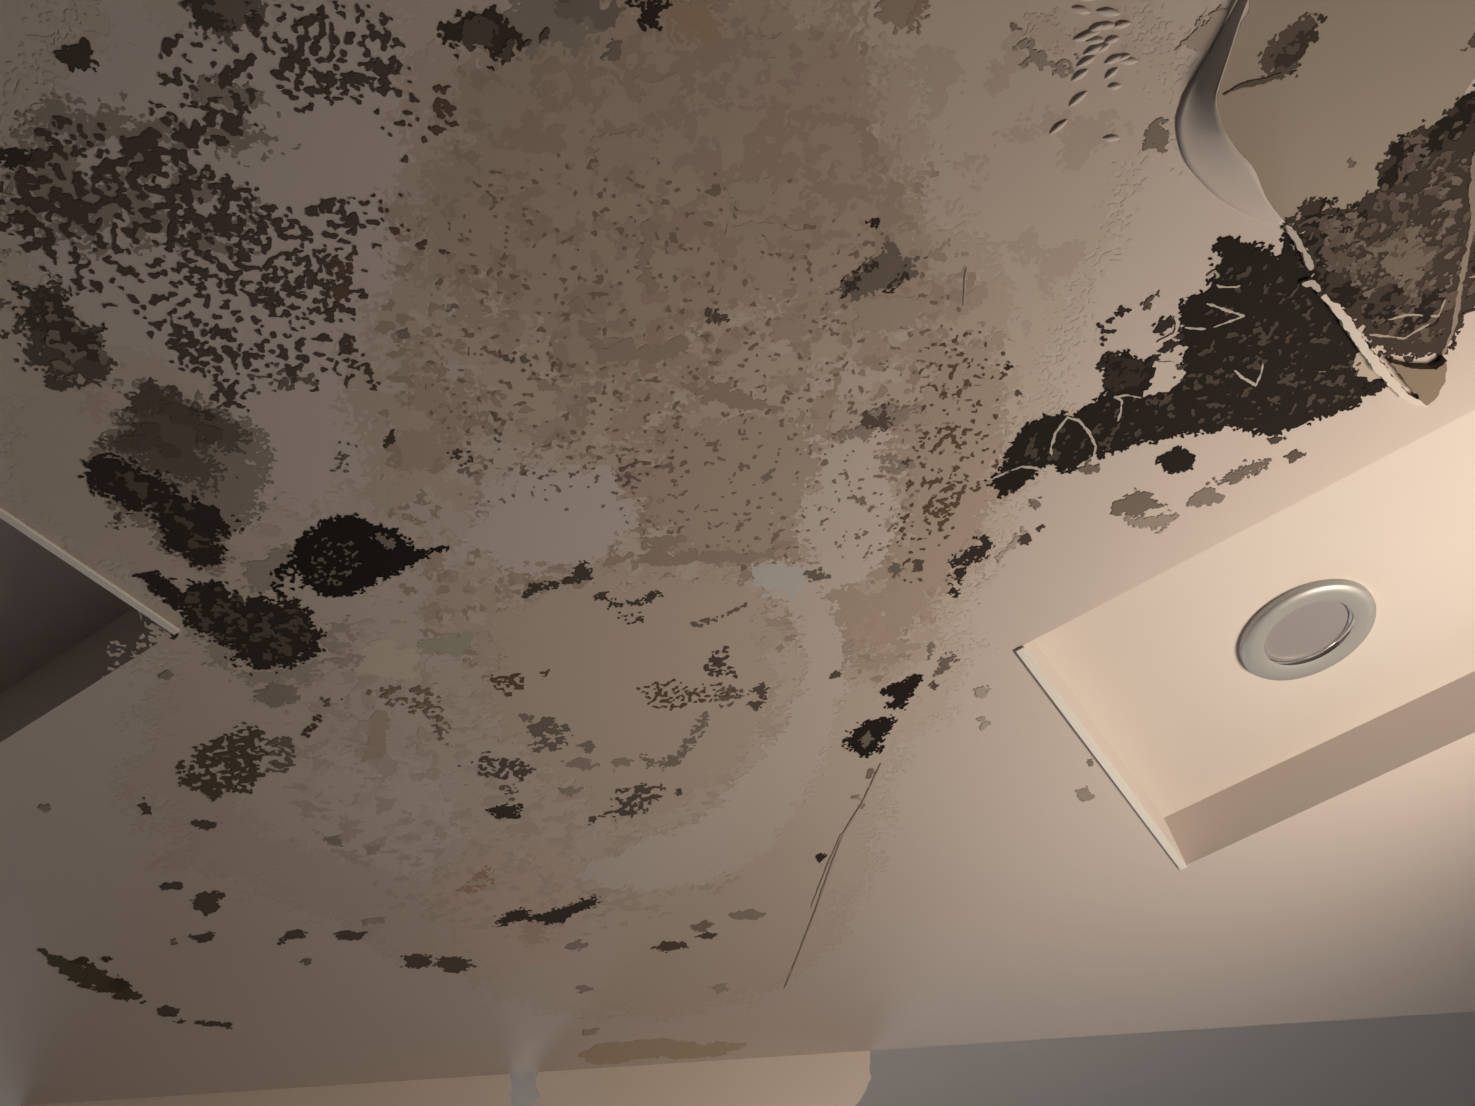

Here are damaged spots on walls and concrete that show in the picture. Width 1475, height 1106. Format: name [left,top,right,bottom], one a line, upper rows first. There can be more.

peeling [1049,0,1138,134]
damp [1257,12,1328,82]
damp [1285,84,1475,363]
damp [1094,305,1132,346]
damp [1152,316,1176,336]
flaking render [1143,361,1186,398]
flaking render [1353,352,1382,382]
damp [1156,445,1196,474]
damp [1187,449,1307,508]
damp [1110,488,1180,534]
damp [189,887,226,917]
damp [37,948,233,1029]